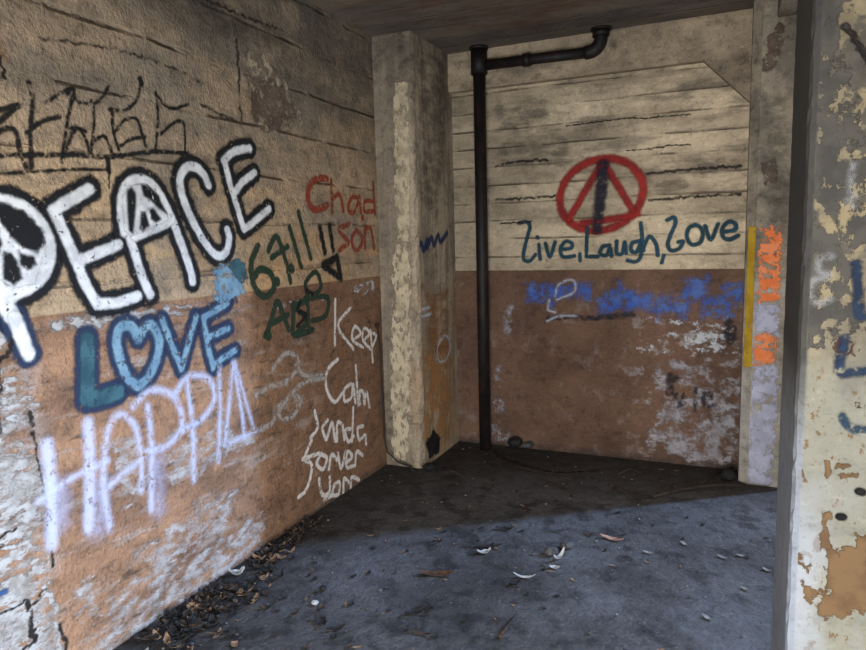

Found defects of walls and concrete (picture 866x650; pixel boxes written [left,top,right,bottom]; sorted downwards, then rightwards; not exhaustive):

crack [0,55,8,80]
peeling [807,0,866,349]
peeling [51,300,210,331]
crack [0,337,15,393]
peeling [0,368,40,430]
peeling [647,328,740,465]
crack [28,411,55,568]
peeling [824,460,859,479]
peeling [0,438,64,650]
peeling [798,511,866,621]
crack [0,589,47,650]
crack [58,624,68,650]